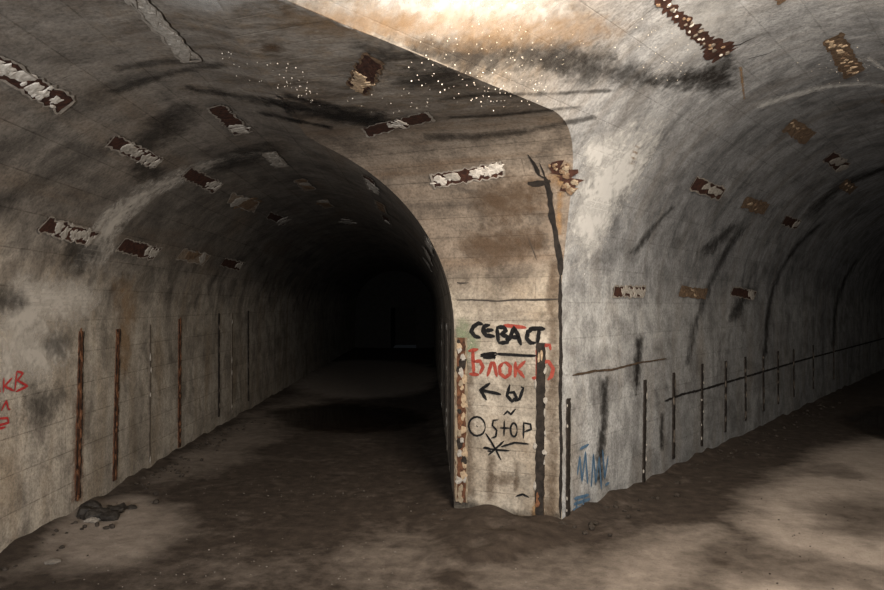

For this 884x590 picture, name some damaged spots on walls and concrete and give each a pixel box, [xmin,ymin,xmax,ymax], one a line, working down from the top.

spalling [655,0,738,63]
spalling [823,32,865,79]
spalling [0,56,75,115]
spalling [346,52,384,96]
spalling [207,104,253,136]
spalling [361,111,436,138]
spalling [105,135,164,169]
spalling [429,161,505,189]
spalling [37,216,101,247]